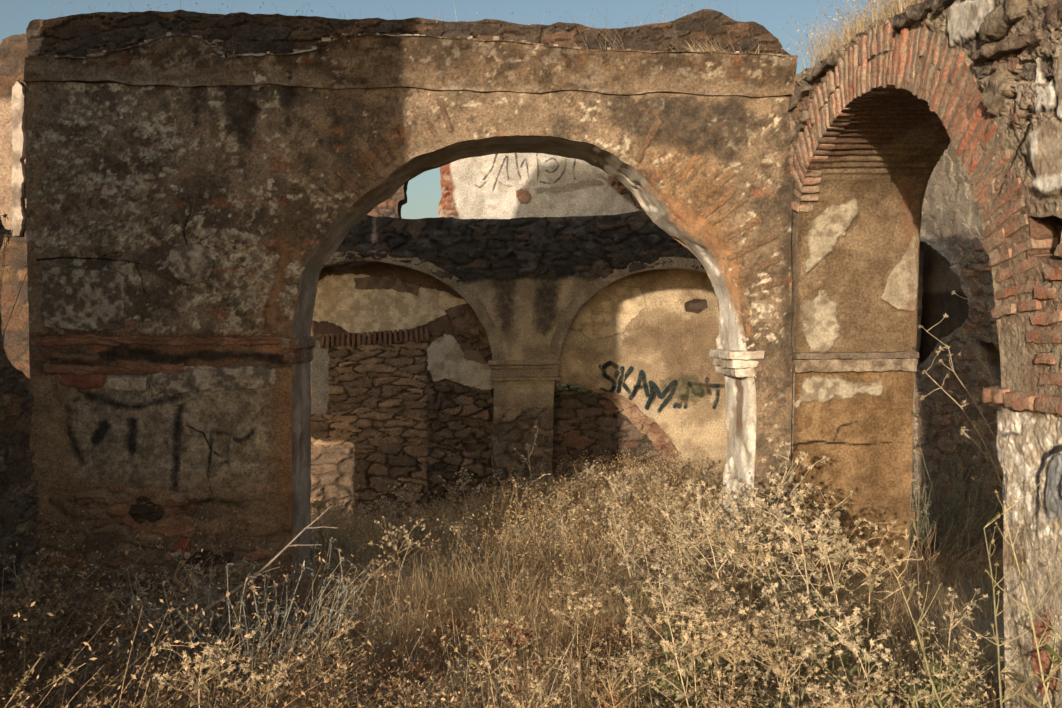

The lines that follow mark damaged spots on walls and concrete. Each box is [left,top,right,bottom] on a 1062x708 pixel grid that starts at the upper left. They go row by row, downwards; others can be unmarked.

peeling [805,198,858,273]
crack [36,252,153,293]
flaking render [445,304,493,364]
leakage [535,256,561,335]
peeling [801,290,840,353]
peeling [794,375,883,408]